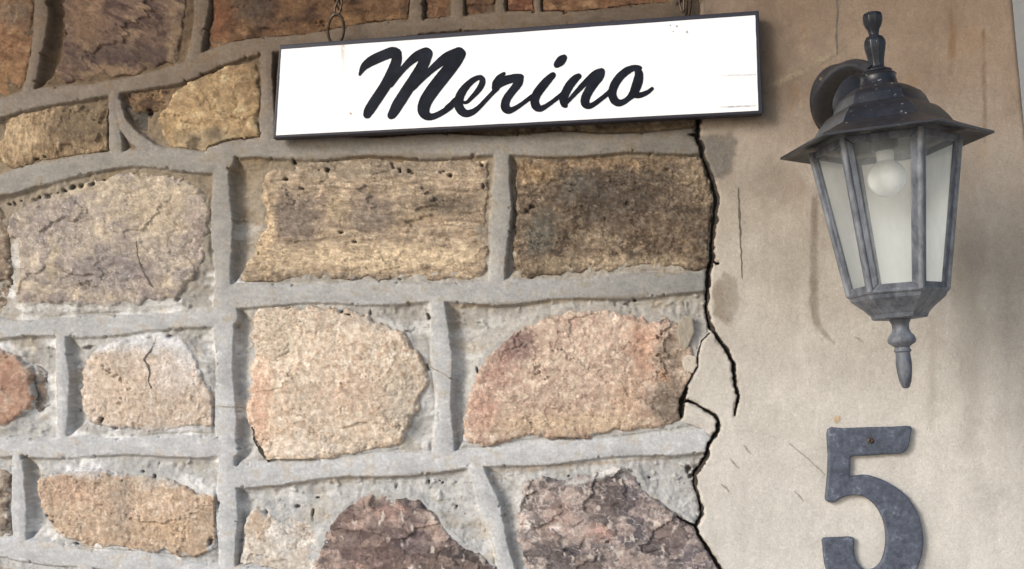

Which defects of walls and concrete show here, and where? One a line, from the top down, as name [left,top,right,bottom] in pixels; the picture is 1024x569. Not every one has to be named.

crack [143,339,156,388]
crack [677,119,739,569]